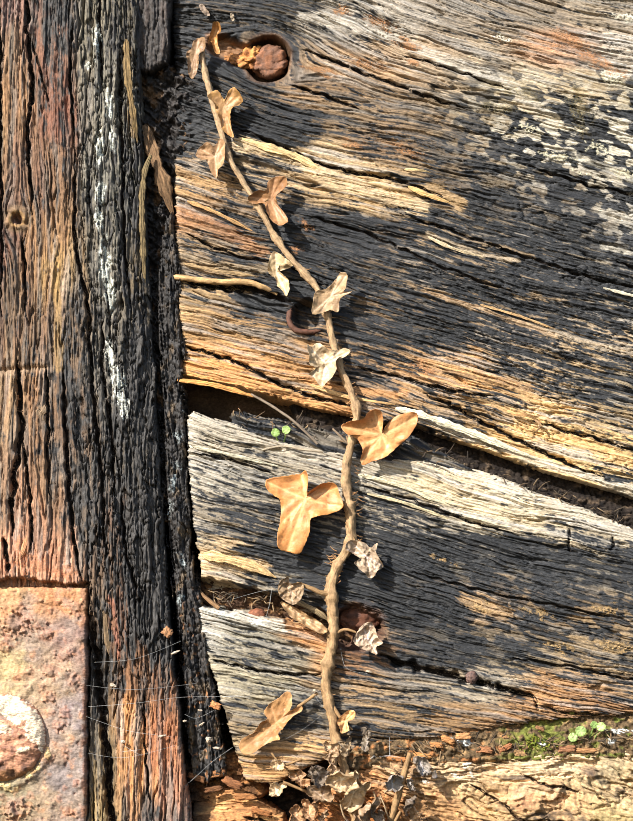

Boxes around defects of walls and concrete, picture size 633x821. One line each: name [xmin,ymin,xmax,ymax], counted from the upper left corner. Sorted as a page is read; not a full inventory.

crack [0,0,141,821]
crack [520,773,584,795]
crack [471,785,561,821]